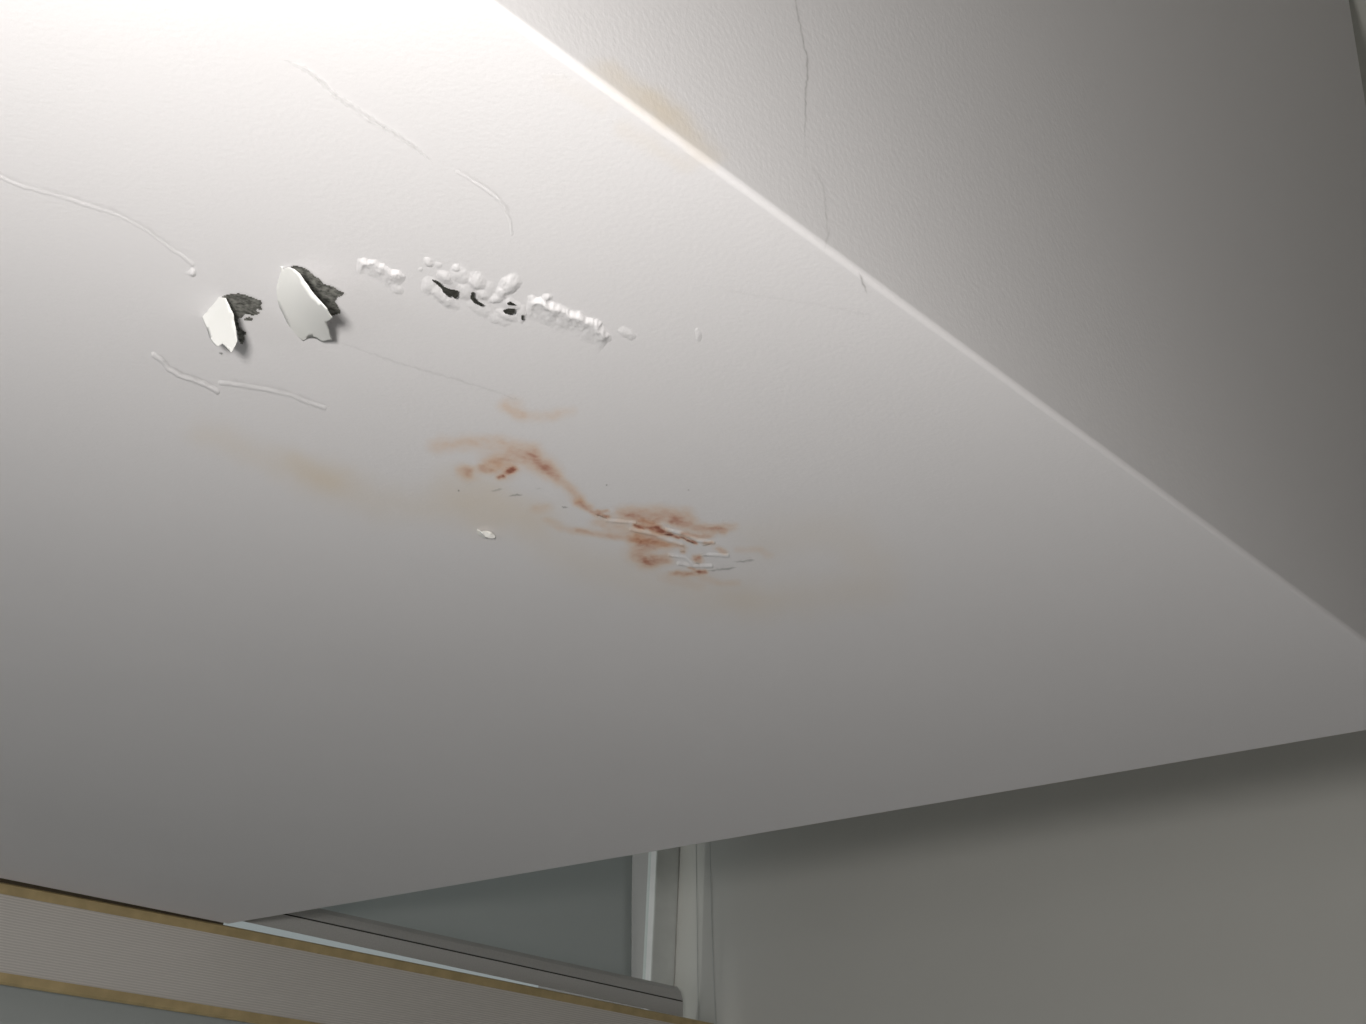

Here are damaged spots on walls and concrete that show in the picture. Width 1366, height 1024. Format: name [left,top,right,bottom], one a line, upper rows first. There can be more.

peeling [202,266,344,353]
rust [606,518,730,572]